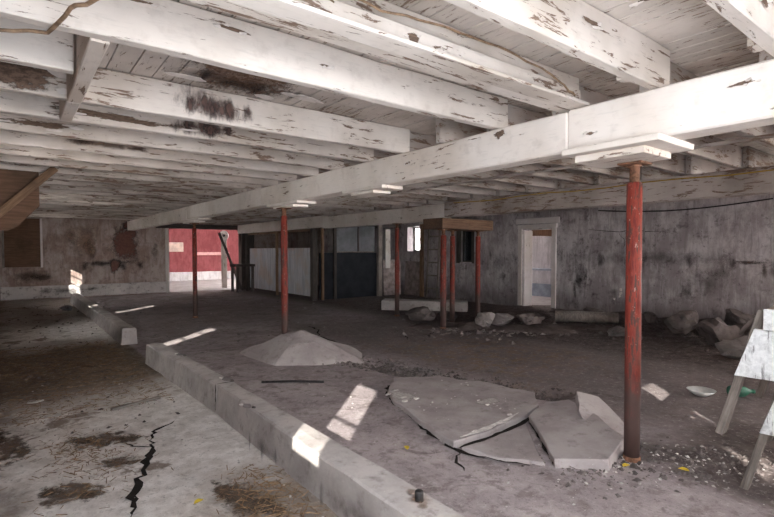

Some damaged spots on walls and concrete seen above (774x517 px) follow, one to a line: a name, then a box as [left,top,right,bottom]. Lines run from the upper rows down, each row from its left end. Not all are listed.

peeling [583,16,603,30]
peeling [165,61,324,104]
water stain [174,91,251,137]
flaking render [110,221,139,273]
crack [385,385,553,471]
crack [125,421,174,516]